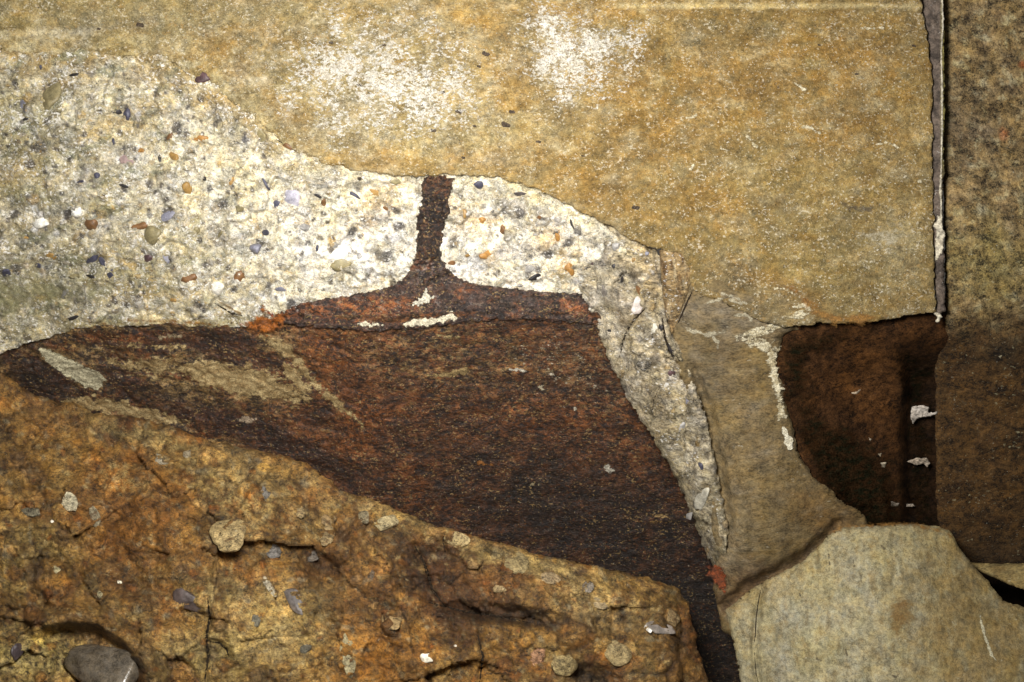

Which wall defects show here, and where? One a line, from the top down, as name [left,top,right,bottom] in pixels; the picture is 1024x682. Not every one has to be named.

water stain [686,327,721,347]
water stain [708,287,934,526]
crack [204,597,229,681]